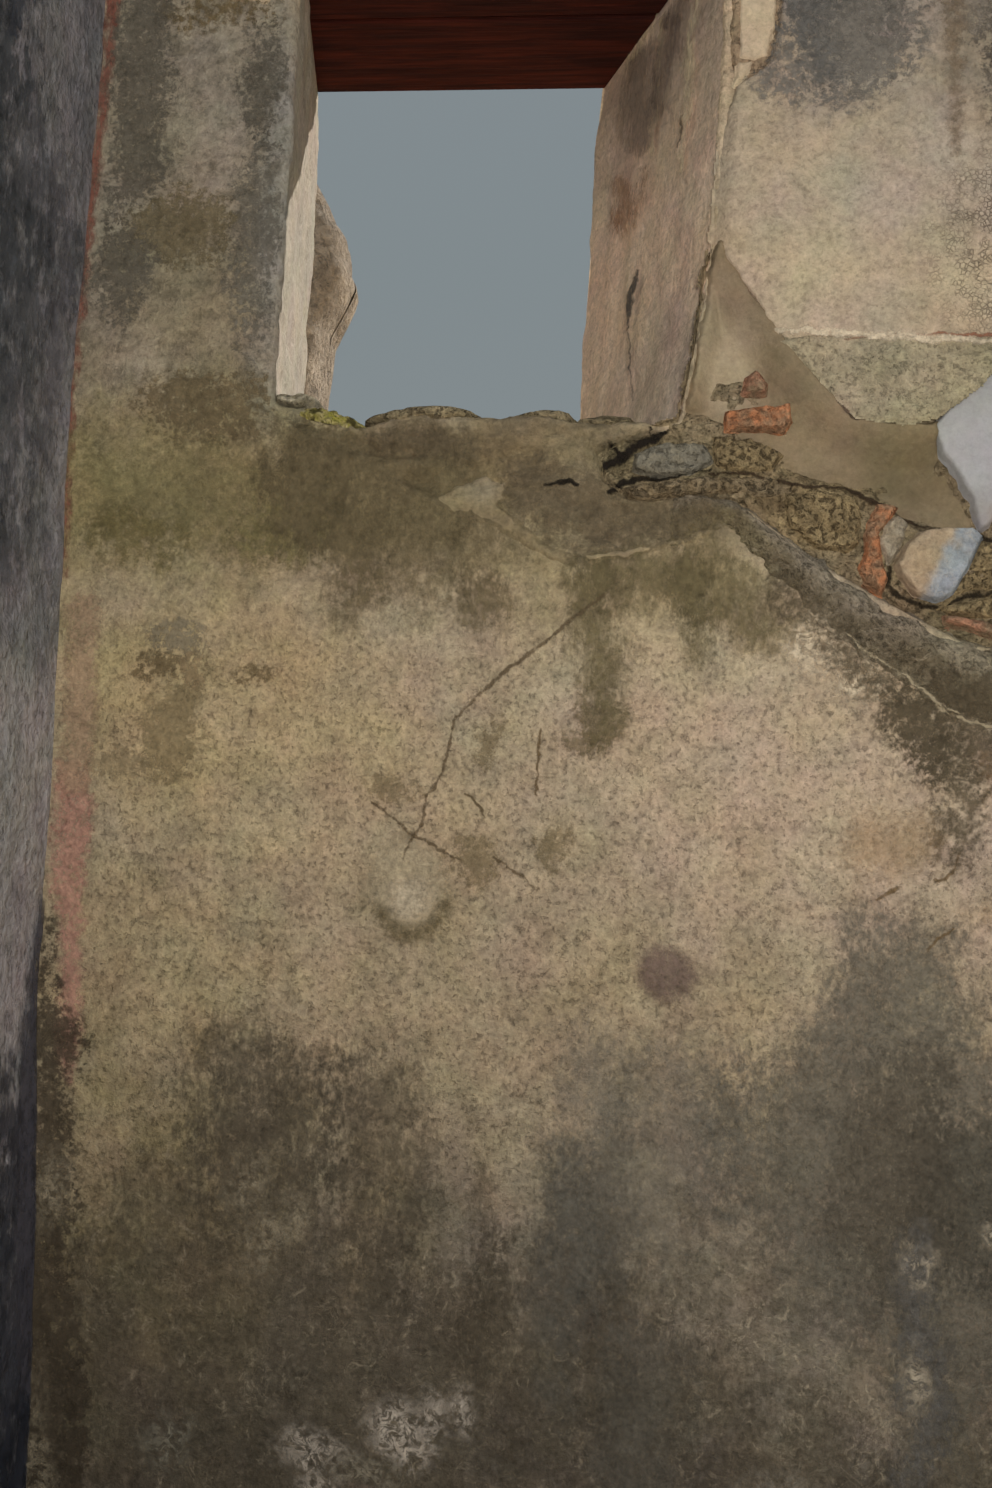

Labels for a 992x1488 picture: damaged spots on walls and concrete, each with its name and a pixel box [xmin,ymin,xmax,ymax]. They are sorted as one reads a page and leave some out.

peeling [730,0,783,89]
damp [753,0,992,121]
damp [0,0,289,584]
damp [263,422,522,629]
spalling [597,246,992,647]
crack [372,594,605,859]
damp [498,452,992,870]
crack [493,856,539,889]
damp [639,947,695,998]
damp [0,900,91,1488]
damp [694,912,992,1488]
efflorescence [292,1395,470,1488]